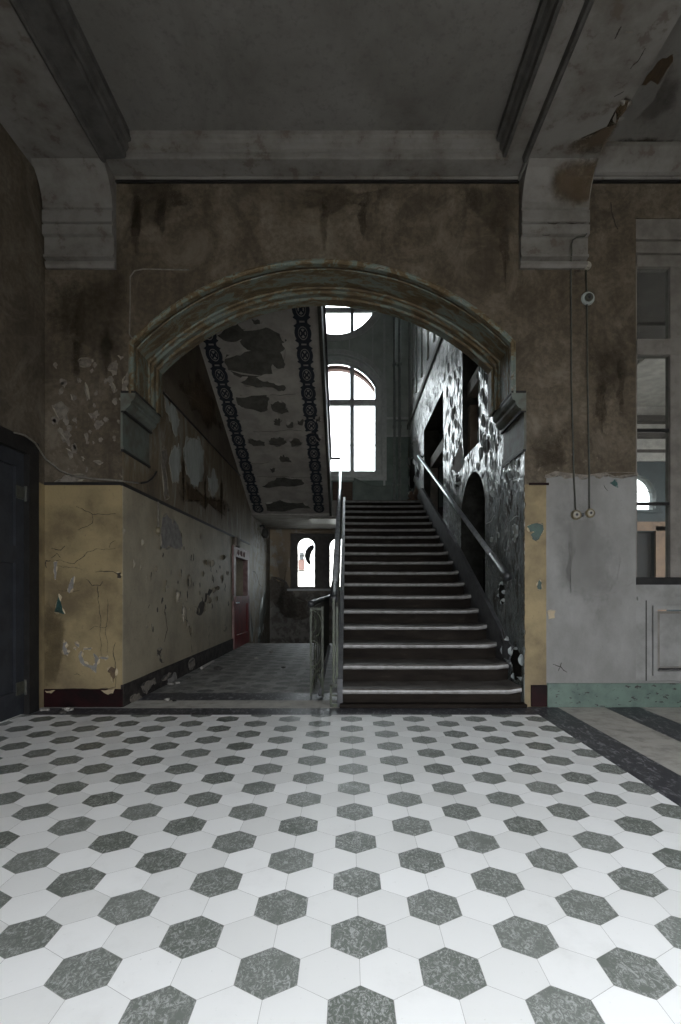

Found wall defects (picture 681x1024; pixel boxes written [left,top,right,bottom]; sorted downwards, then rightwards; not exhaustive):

peeling [642,54,674,85]
crack [45,506,117,689]
peeling [51,355,129,482]
peeling [117,513,234,634]
peeling [164,393,219,498]
peeling [217,317,323,512]
spalling [408,458,419,491]
peeling [444,352,463,490]
peeling [476,365,518,512]
peeling [490,522,544,543]
peeling [62,640,118,694]